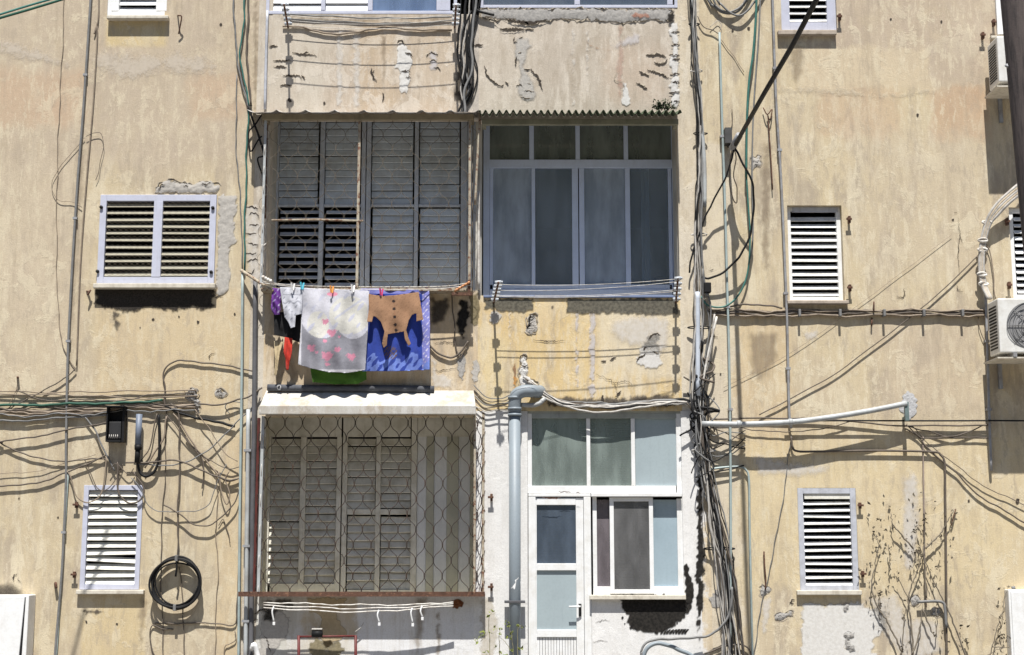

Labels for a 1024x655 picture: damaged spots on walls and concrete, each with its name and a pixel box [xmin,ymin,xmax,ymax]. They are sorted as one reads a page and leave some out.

peeling [395,39,413,93]
spalling [479,6,680,107]
spalling [155,178,221,195]
spalling [525,312,538,335]
peeling [615,317,668,368]
peeling [759,583,943,655]